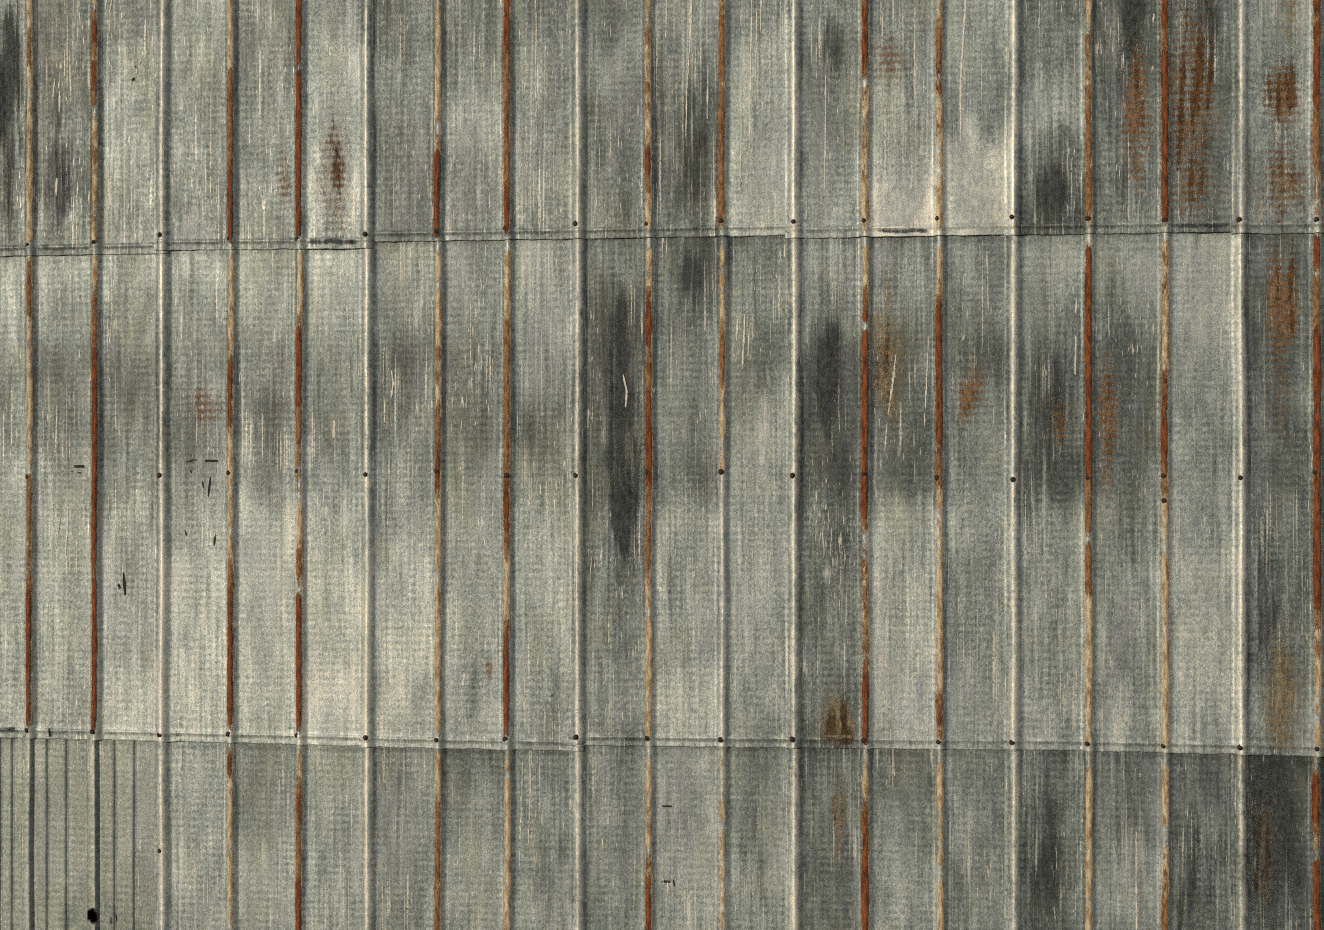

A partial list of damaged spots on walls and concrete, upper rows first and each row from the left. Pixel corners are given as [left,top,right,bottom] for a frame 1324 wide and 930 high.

leakage [0,9,22,213]
rust [321,120,348,237]
rust [1122,0,1221,223]
leakage [606,295,638,558]
leakage [816,323,841,439]
rust [821,0,907,745]
rust [1258,0,1323,752]
rust [861,762,870,930]
rust [1312,770,1321,930]